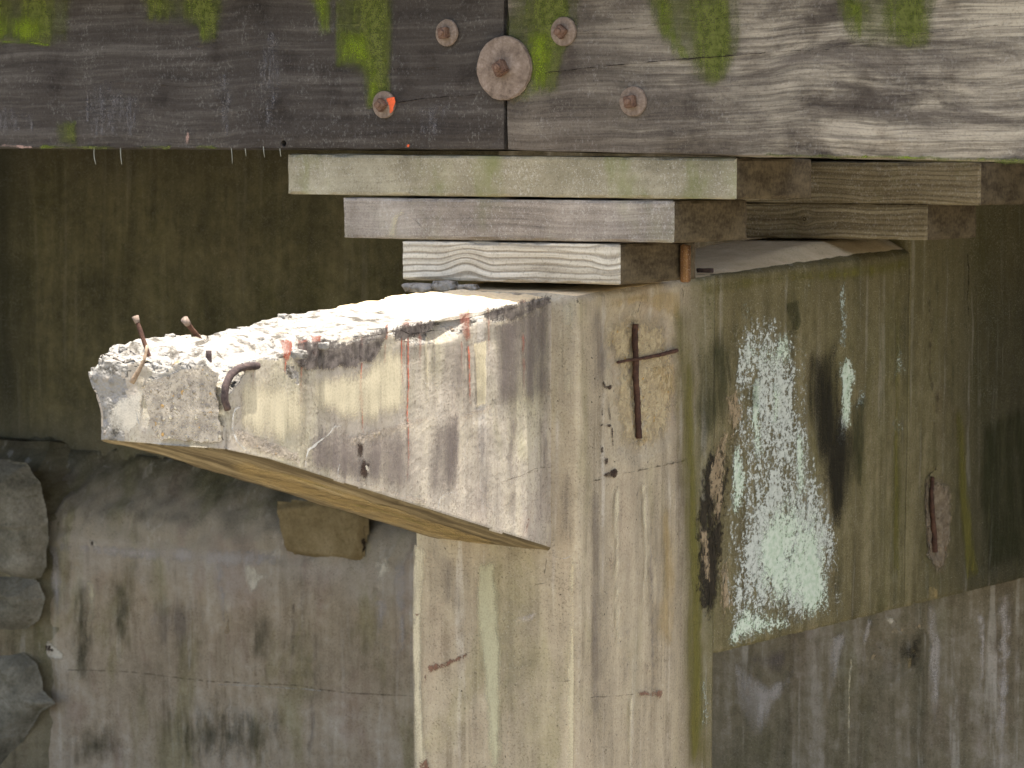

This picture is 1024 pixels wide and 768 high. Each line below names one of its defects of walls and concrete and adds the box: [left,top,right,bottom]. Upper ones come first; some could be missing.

spalling [129,345,261,443]
corrosion [401,322,421,458]
corrosion [461,310,471,395]
peeling [695,390,743,619]
water stain [728,285,864,644]
spalling [925,468,951,571]